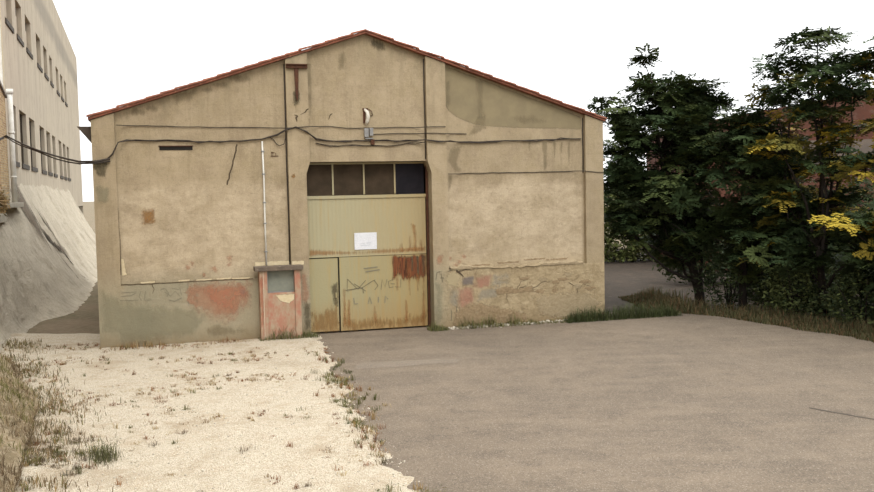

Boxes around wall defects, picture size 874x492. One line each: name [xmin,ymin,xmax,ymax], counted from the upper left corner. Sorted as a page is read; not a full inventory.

corrosion [392,254,427,280]